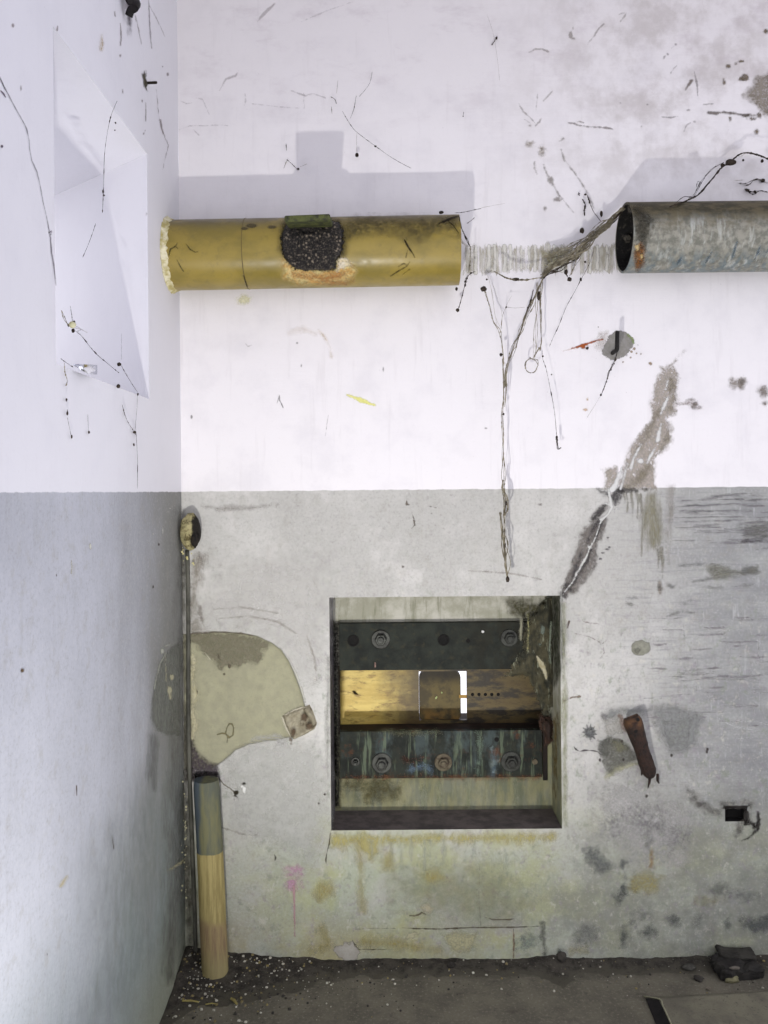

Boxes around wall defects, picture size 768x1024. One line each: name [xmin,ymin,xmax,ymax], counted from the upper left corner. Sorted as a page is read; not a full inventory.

leakage [605,360,701,563]
spalling [152,632,312,871]
leakage [332,833,554,863]